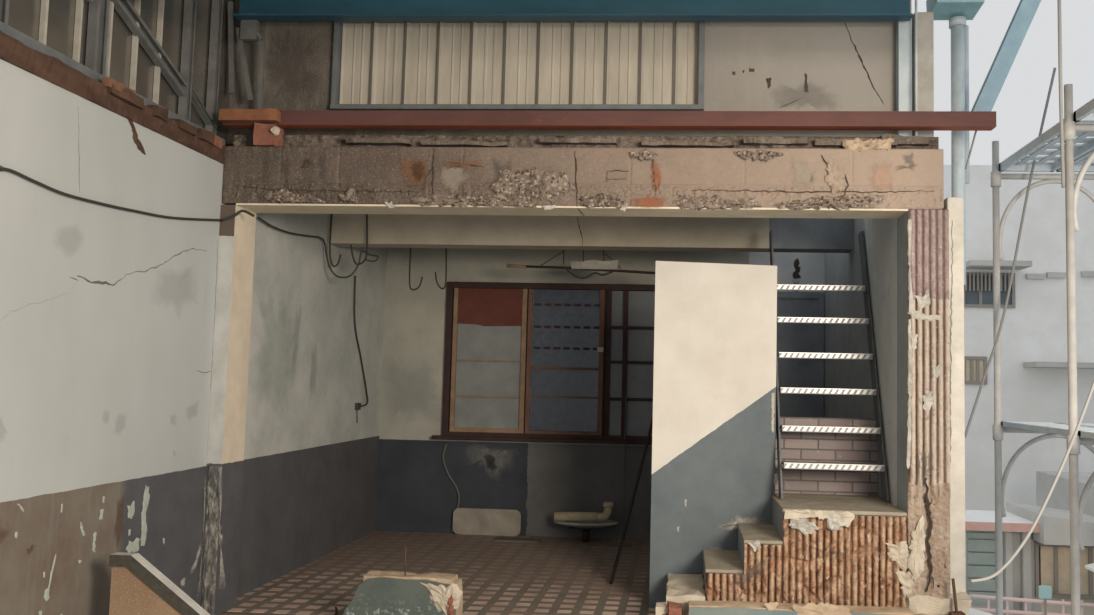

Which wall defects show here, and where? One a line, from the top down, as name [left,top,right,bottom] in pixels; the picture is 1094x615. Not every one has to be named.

crack [845,23,884,105]
spalling [233,135,255,146]
spalling [282,135,939,212]
rust [637,163,662,207]
crack [0,239,218,323]
spalling [907,219,942,469]
crack [947,220,955,463]
peeling [469,447,512,477]
peeling [39,554,56,615]
peeling [126,486,150,553]
spalling [705,510,926,615]
crack [924,478,951,592]